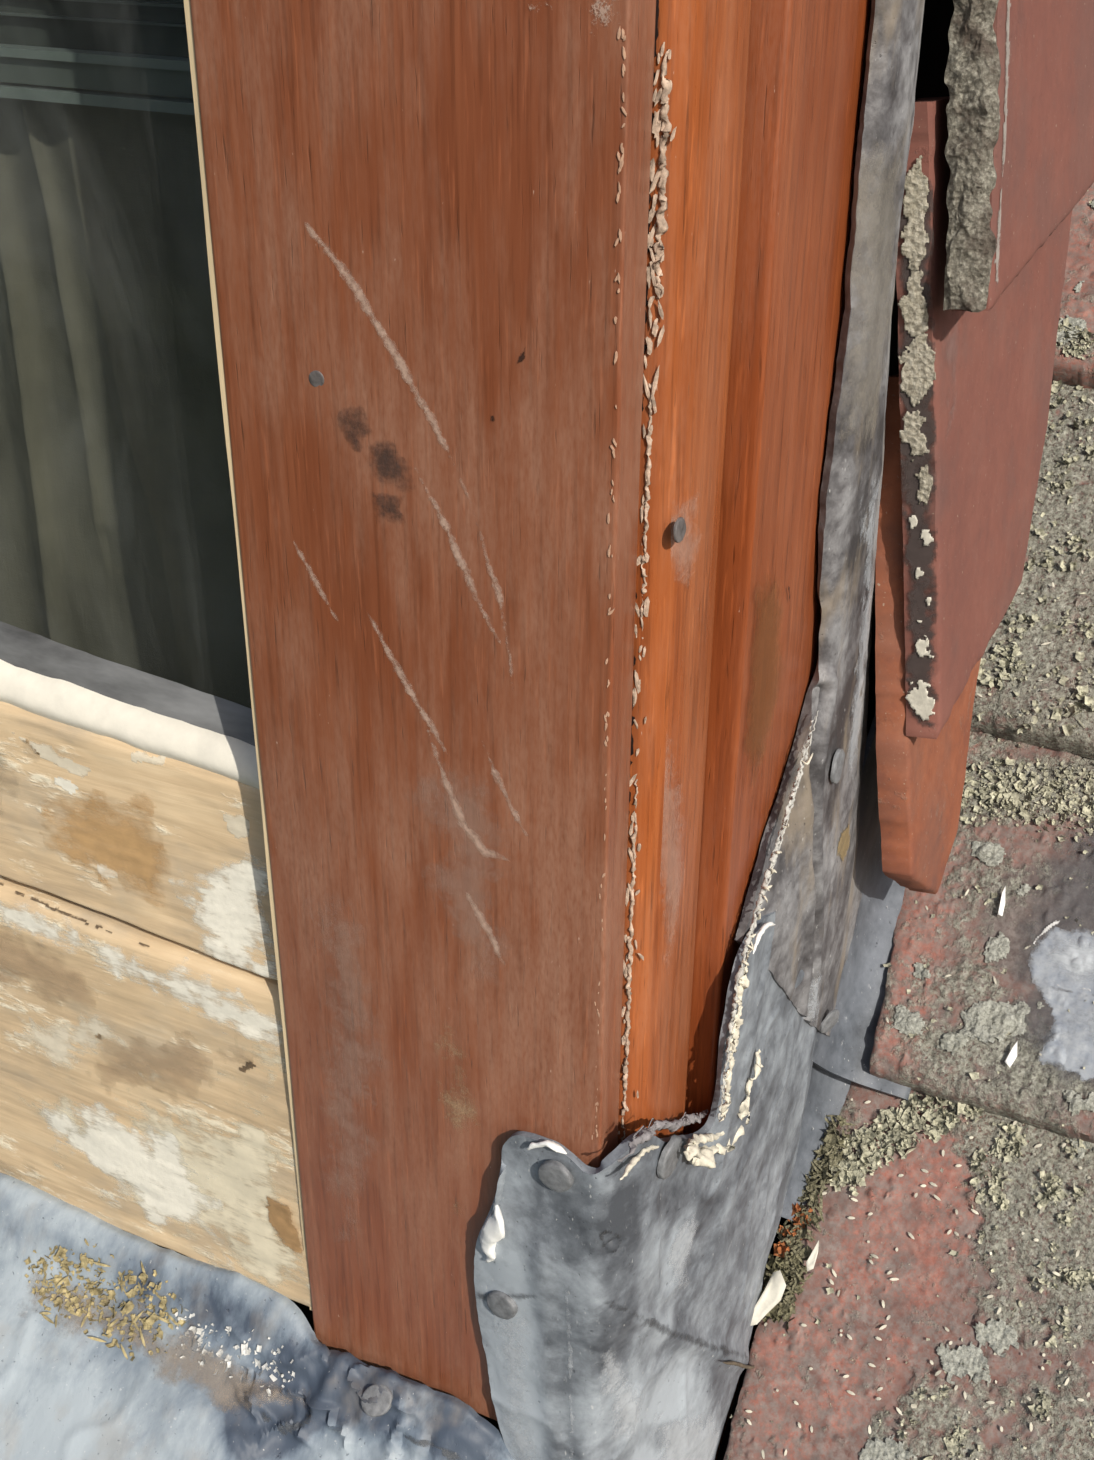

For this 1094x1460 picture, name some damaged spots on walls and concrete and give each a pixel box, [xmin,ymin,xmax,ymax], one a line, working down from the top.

damp [375,445,401,478]
peeling [19,736,91,795]
peeling [131,751,166,764]
peeling [223,814,250,838]
peeling [97,864,118,880]
peeling [170,860,276,979]
peeling [0,905,286,1076]
peeling [39,1097,303,1287]